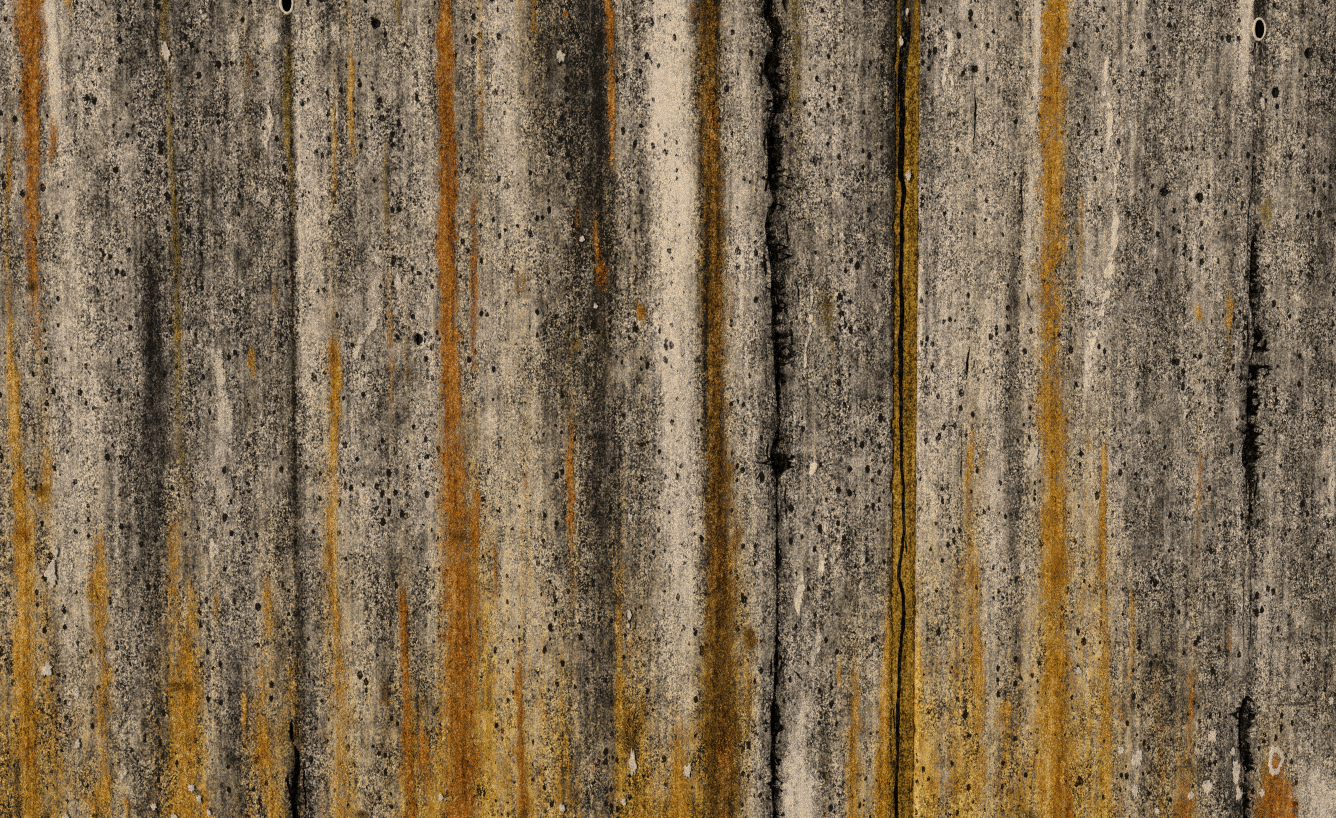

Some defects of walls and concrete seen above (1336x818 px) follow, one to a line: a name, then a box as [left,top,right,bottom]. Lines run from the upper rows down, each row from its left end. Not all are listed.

rust [4,0,129,818]
rust [167,521,203,818]
rust [241,664,283,818]
rust [378,0,499,818]
leakage [542,0,615,313]
rust [631,0,757,818]
crack [754,0,807,818]
rust [836,616,892,818]
crack [893,0,911,818]
rust [1002,0,1083,818]
crack [1226,150,1283,818]
rust [1256,756,1300,818]